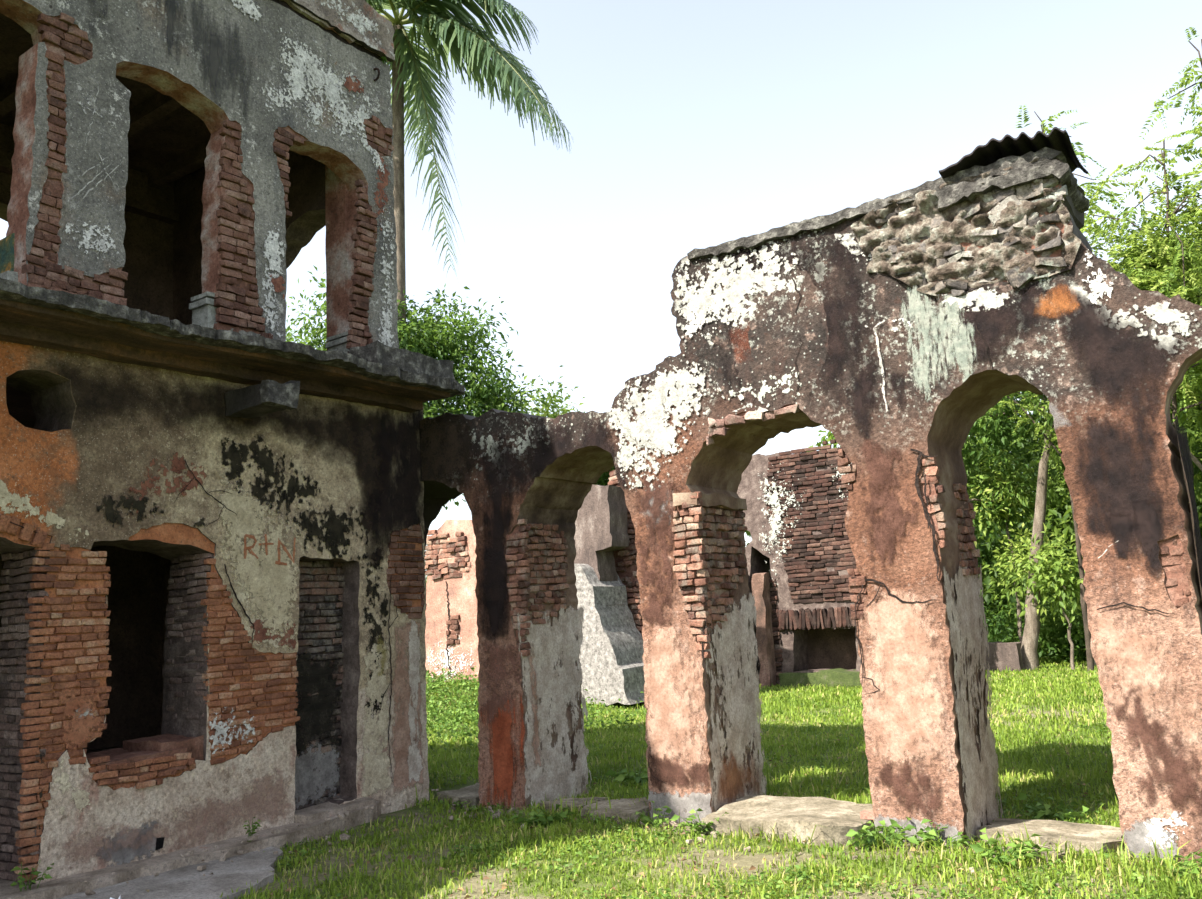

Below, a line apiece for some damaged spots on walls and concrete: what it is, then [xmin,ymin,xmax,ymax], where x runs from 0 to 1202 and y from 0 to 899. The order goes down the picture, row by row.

spalling [21,12,128,306]
spalling [213,28,395,352]
spalling [0,451,301,884]
damp [221,435,388,678]
damp [466,422,679,638]
spalling [608,470,620,487]
spalling [706,404,800,446]
crack [851,449,939,694]
damp [1061,289,1178,577]
crack [1097,602,1172,614]